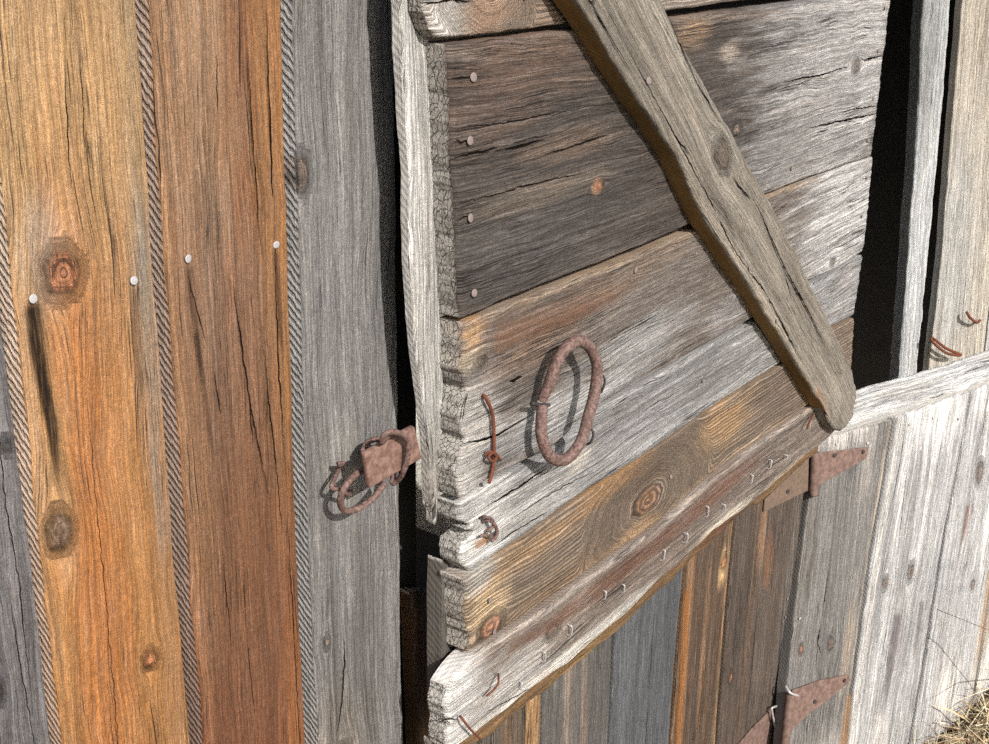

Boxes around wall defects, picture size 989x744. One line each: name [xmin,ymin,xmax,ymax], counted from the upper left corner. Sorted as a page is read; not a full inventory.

crack [784,56,879,88]
crack [455,109,607,158]
crack [458,173,581,221]